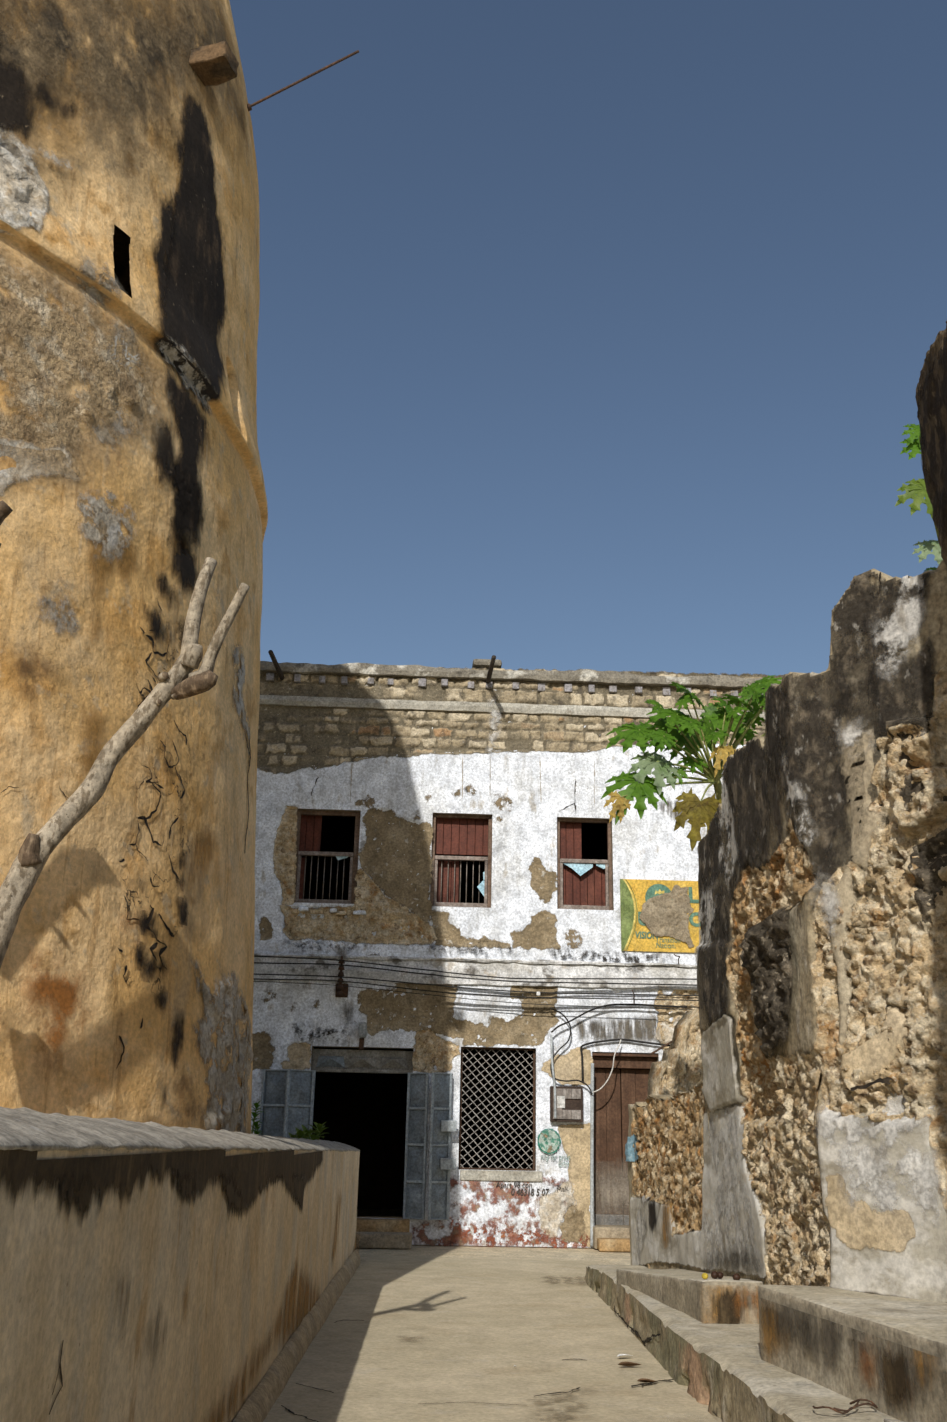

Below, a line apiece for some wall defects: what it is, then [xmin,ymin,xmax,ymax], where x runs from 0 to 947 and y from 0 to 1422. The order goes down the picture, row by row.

peeling [0,129,71,233]
damp [0,0,243,645]
peeling [0,251,215,561]
crack [130,599,175,708]
crack [116,720,190,1069]
peeling [193,962,312,1133]
spalling [259,794,582,956]
peeling [357,983,593,1086]
spalling [654,990,699,1050]
spalling [726,664,947,1287]
damp [0,1149,323,1222]
peeling [412,1178,590,1249]